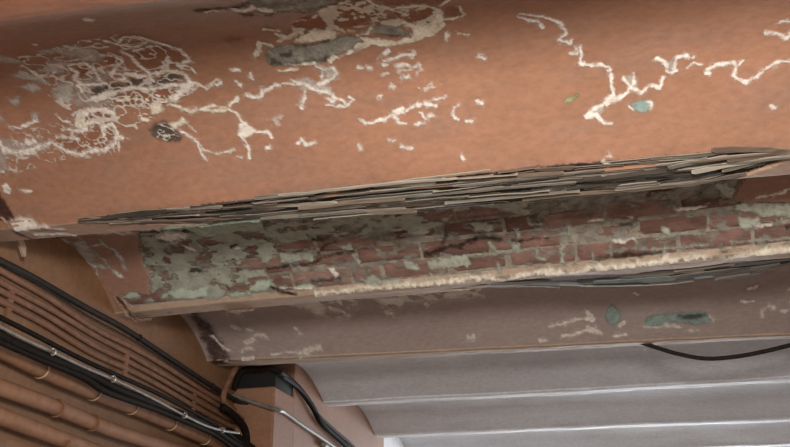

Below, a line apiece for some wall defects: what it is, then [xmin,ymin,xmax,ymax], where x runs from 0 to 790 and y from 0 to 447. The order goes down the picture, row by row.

peeling [0,35,222,173]
flaking render [194,0,469,72]
crack [517,13,790,125]
flaking render [0,183,31,228]
flaking render [78,146,790,322]
flaking render [643,312,715,332]